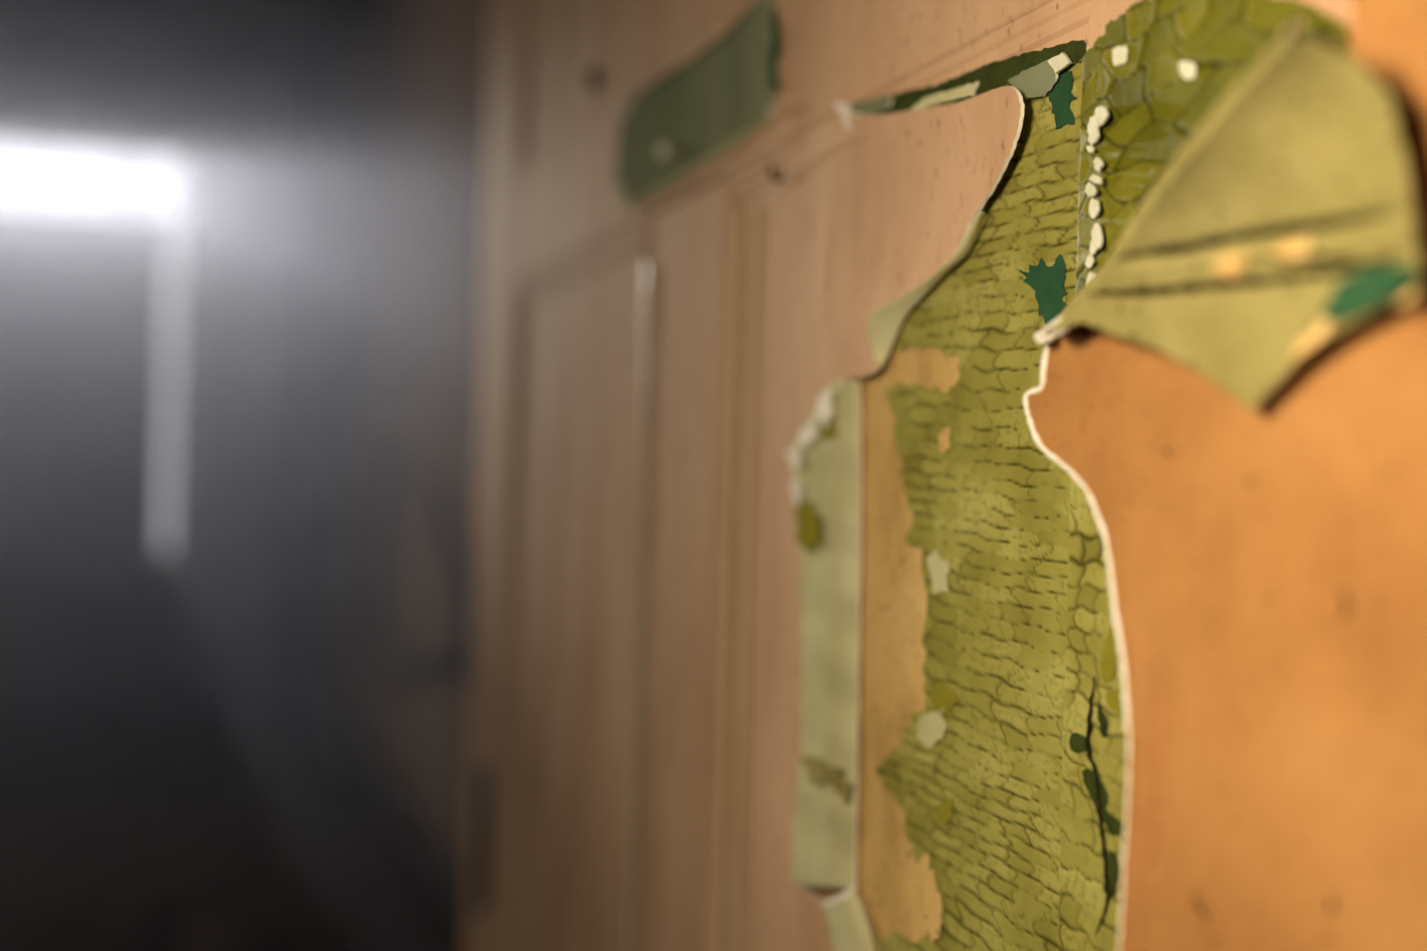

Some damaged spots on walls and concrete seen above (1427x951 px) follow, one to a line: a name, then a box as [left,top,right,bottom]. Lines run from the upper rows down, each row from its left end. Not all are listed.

peeling [614,0,780,208]
peeling [737,0,1427,951]